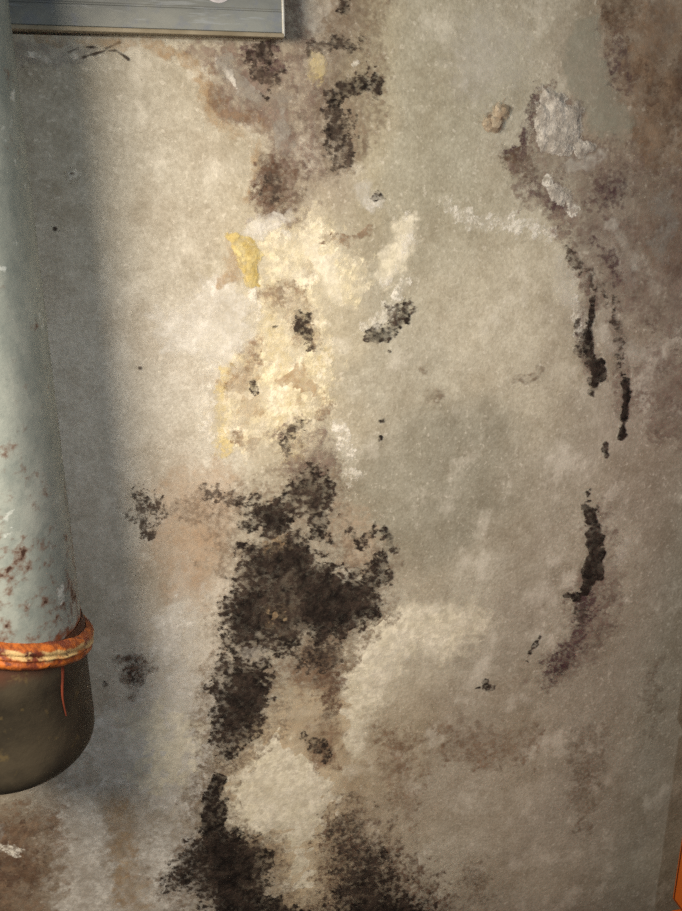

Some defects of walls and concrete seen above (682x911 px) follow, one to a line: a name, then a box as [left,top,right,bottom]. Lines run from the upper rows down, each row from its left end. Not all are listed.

water stain [445,2,682,441]
water stain [0,0,491,911]
water stain [525,488,623,689]